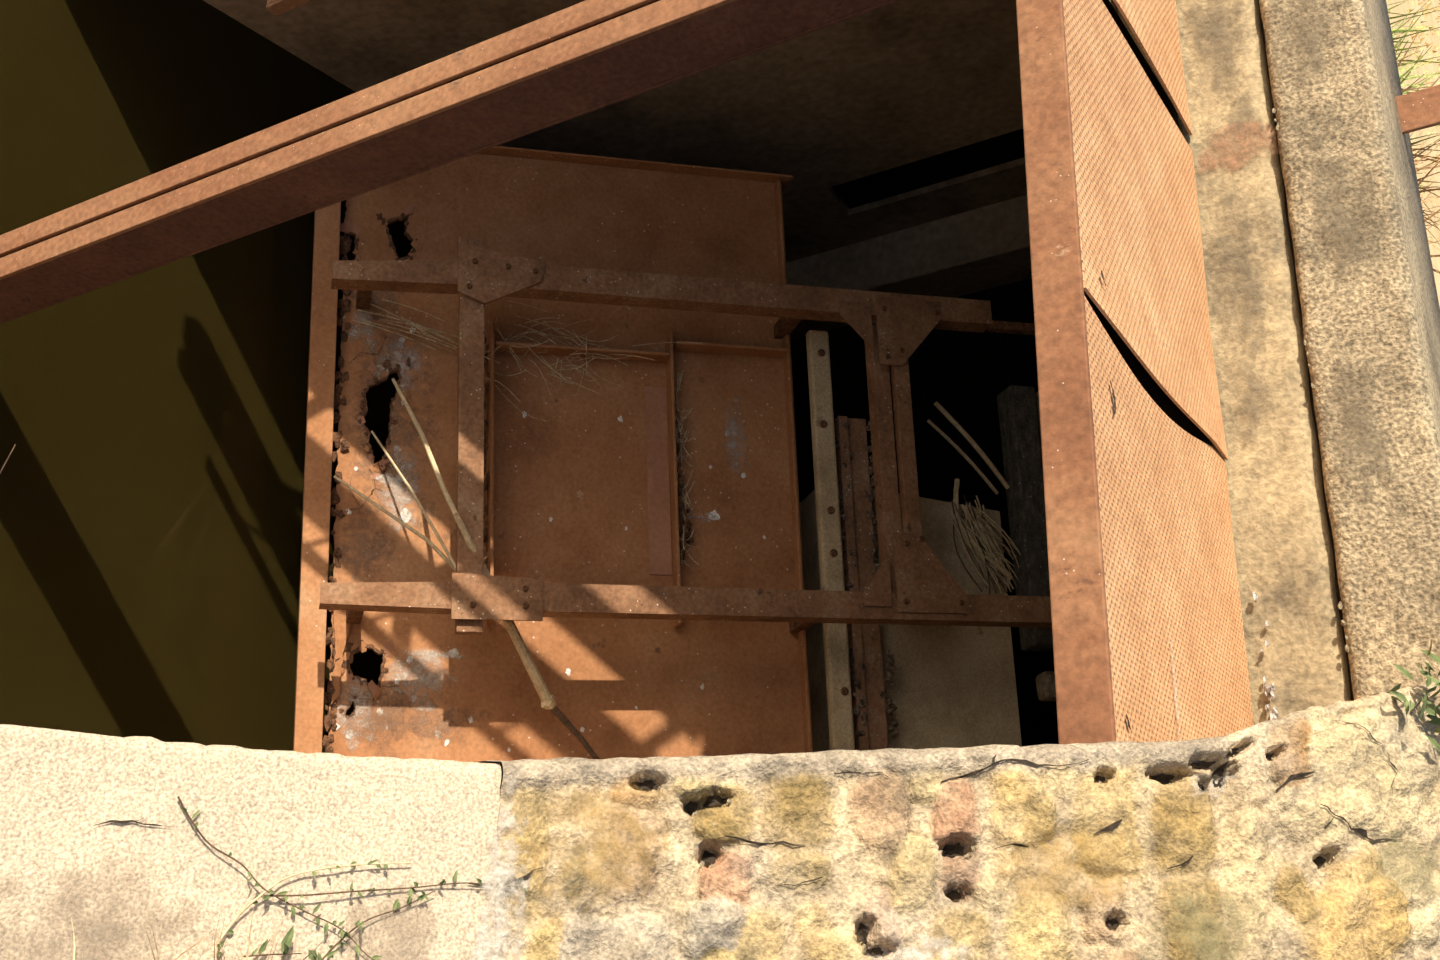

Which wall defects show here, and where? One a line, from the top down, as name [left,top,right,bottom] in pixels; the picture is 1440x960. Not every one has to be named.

rust [355,399,428,497]
rust [675,419,694,563]
rust [331,614,467,757]
crack [93,817,170,827]
crack [941,754,1089,783]
crack [1275,771,1405,843]